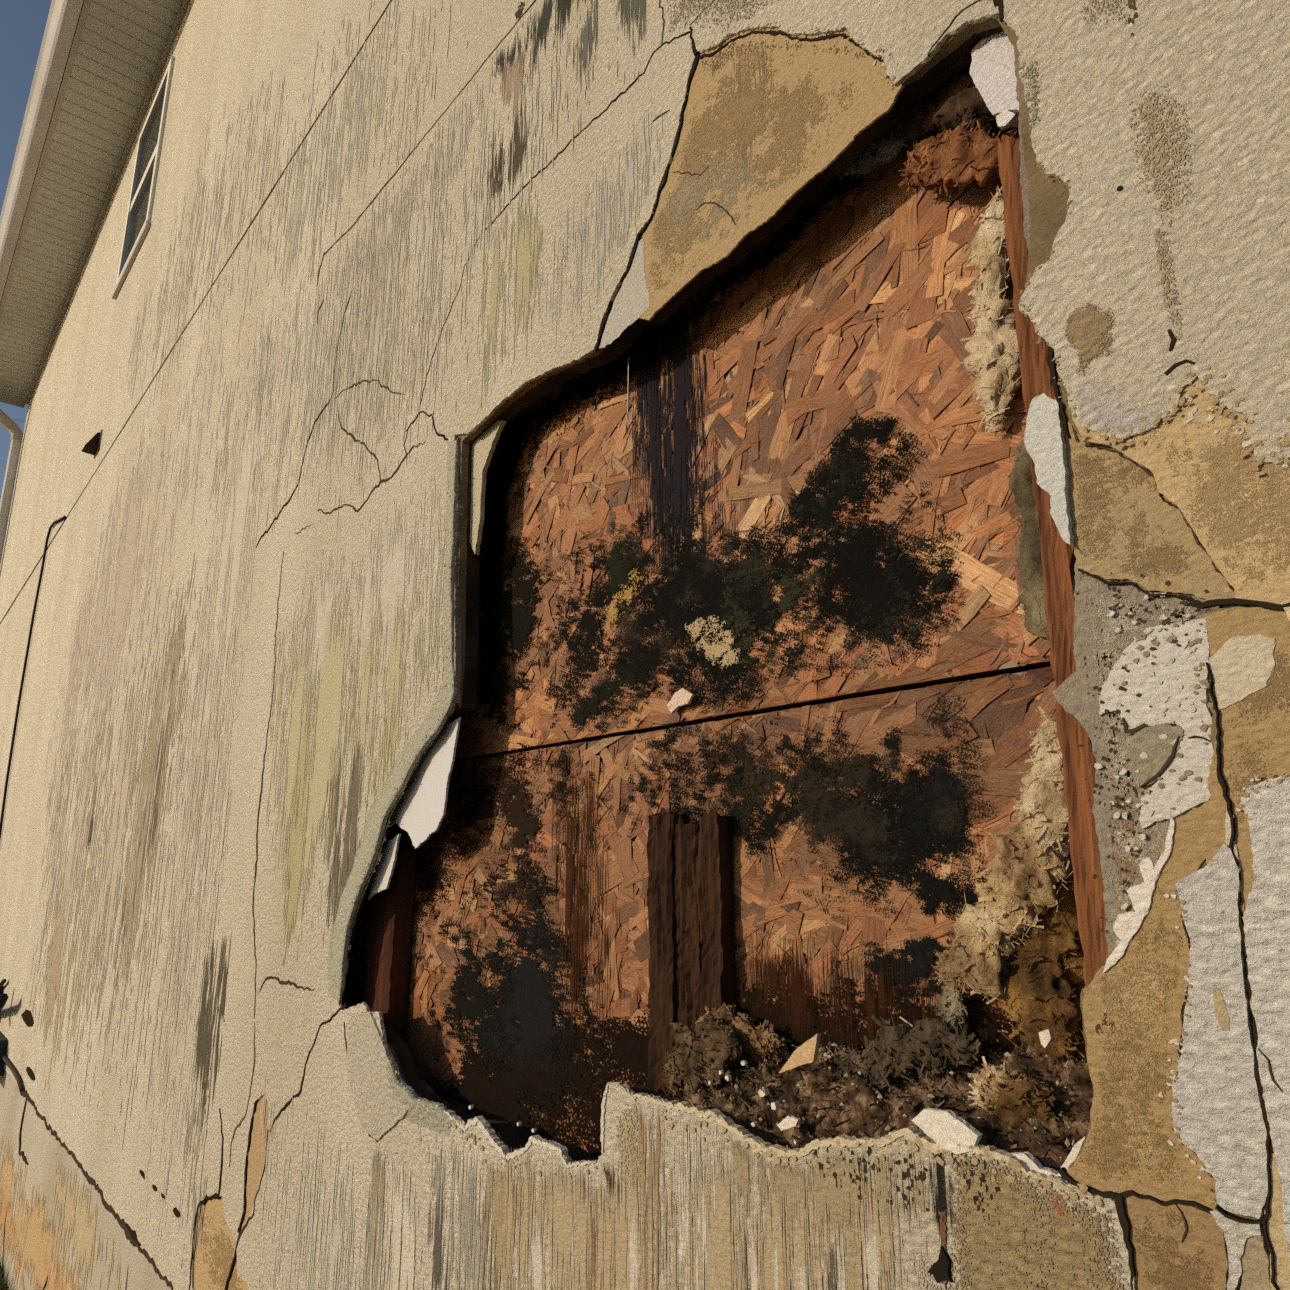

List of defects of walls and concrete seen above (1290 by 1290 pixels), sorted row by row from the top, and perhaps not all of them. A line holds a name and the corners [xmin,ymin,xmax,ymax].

leakage [537,0,865,342]
spalling [599,21,903,349]
crack [927,0,1004,57]
crack [1000,125,1019,134]
peeling [969,31,1072,251]
leakage [1129,84,1195,340]
leakage [22,0,595,1290]
crack [18,0,890,1290]
leakage [258,168,1127,1290]
crack [1,1206,9,1279]
spalling [194,1095,269,1290]
peeling [346,1012,409,1140]